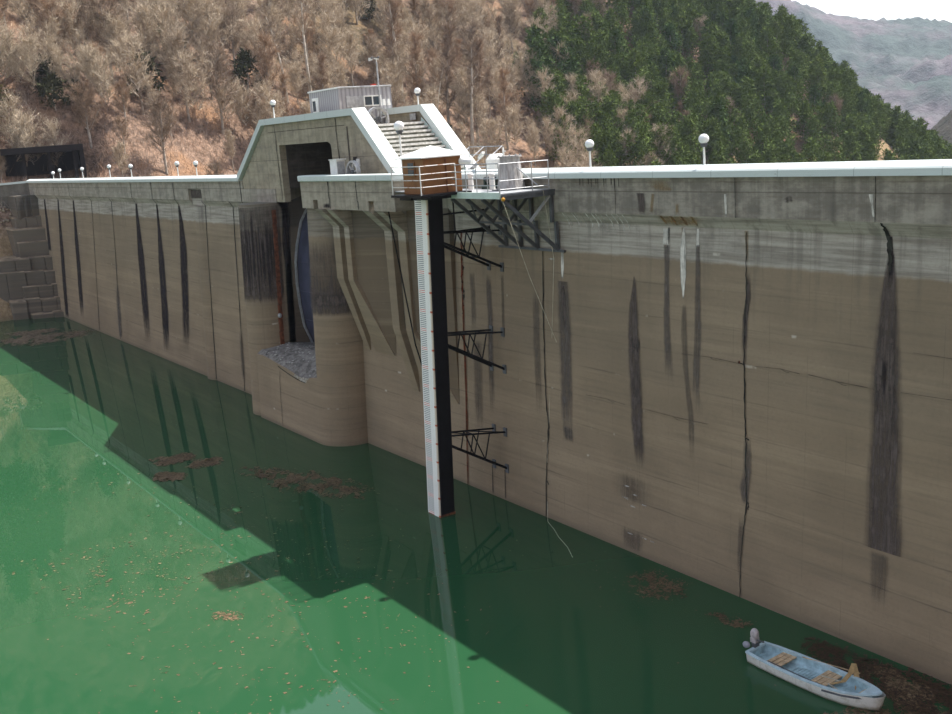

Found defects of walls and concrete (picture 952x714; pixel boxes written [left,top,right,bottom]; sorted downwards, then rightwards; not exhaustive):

damp [135,204,149,330]
damp [156,206,169,341]
damp [178,206,189,337]
damp [238,206,290,301]
damp [550,252,572,439]
damp [628,278,643,456]
damp [663,227,700,398]
crack [686,177,868,598]
damp [868,237,900,584]